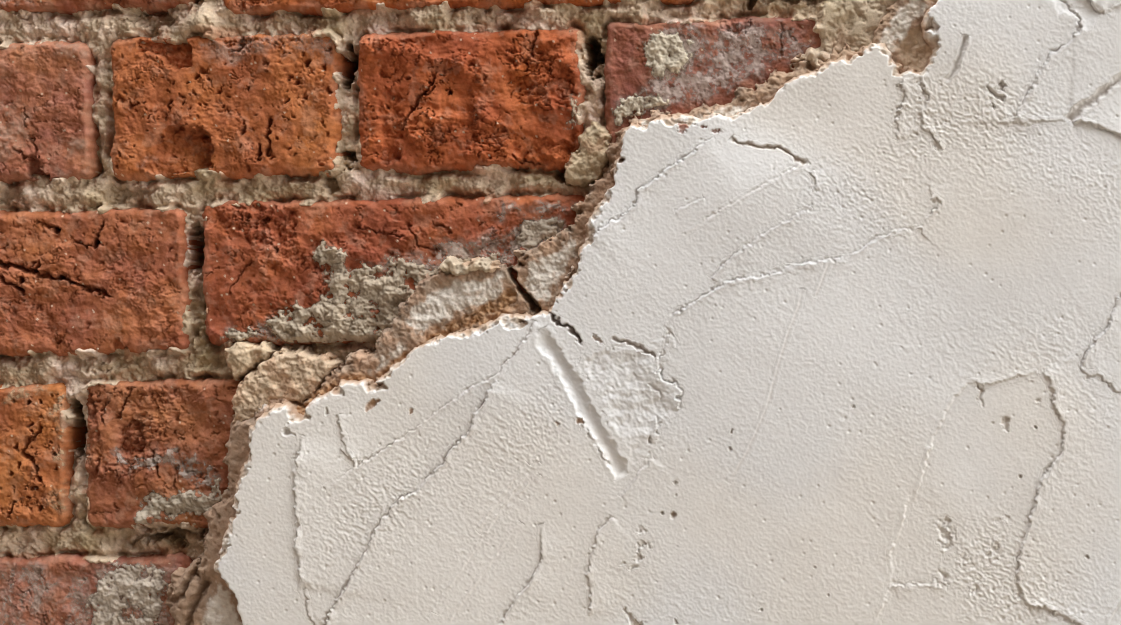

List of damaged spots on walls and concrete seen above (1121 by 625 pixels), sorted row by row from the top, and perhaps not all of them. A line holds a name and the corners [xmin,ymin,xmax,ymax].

spalling [133,36,217,179]
crack [253,117,277,162]
peeling [611,94,669,126]
crack [728,135,822,192]
crack [889,72,946,153]
crack [983,80,1010,110]
spalling [208,200,304,256]
crack [354,197,465,254]
spalling [442,284,520,334]
crack [322,264,686,493]
spalling [530,324,634,482]
spalling [85,386,153,493]